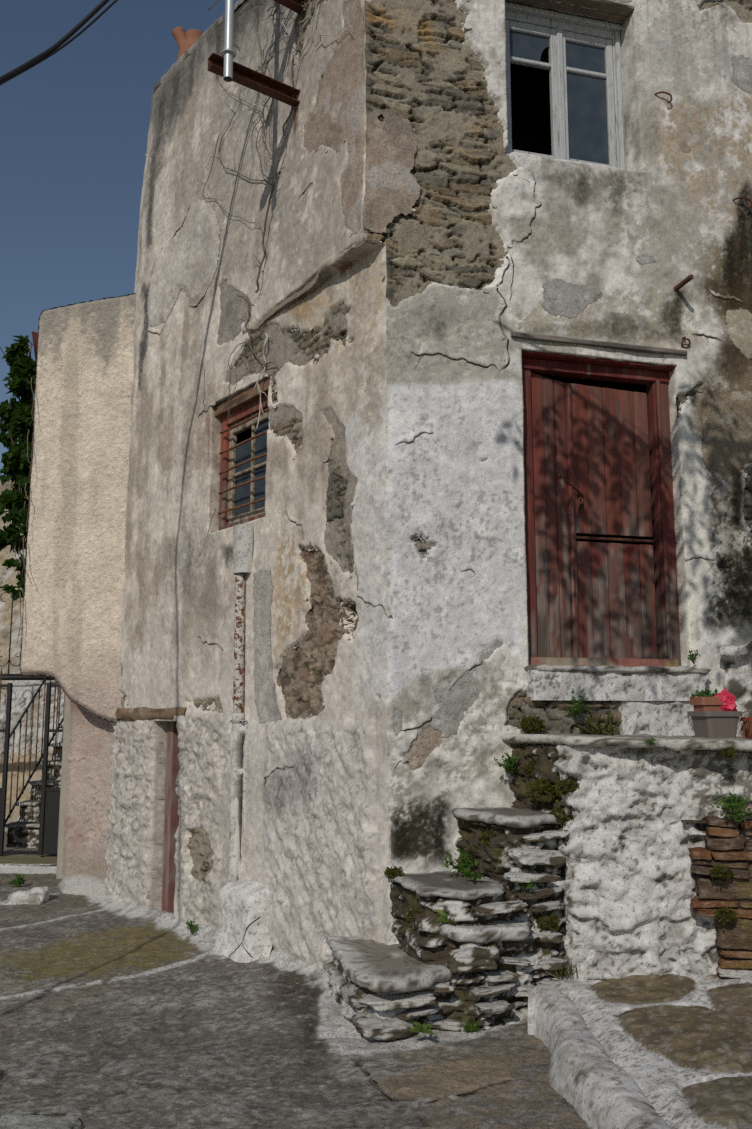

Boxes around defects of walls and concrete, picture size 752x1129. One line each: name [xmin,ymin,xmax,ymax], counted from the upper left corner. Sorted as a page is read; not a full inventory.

crack [159,199,194,254]
crack [180,285,208,307]
flaking render [217,273,354,459]
crack [298,178,313,198]
flaking render [300,0,518,306]
crack [410,171,542,371]
damp [707,184,752,313]
damp [716,344,746,376]
flaking render [676,379,752,543]
damp [732,467,742,529]
flaking render [277,409,358,719]
flaking render [183,827,213,885]